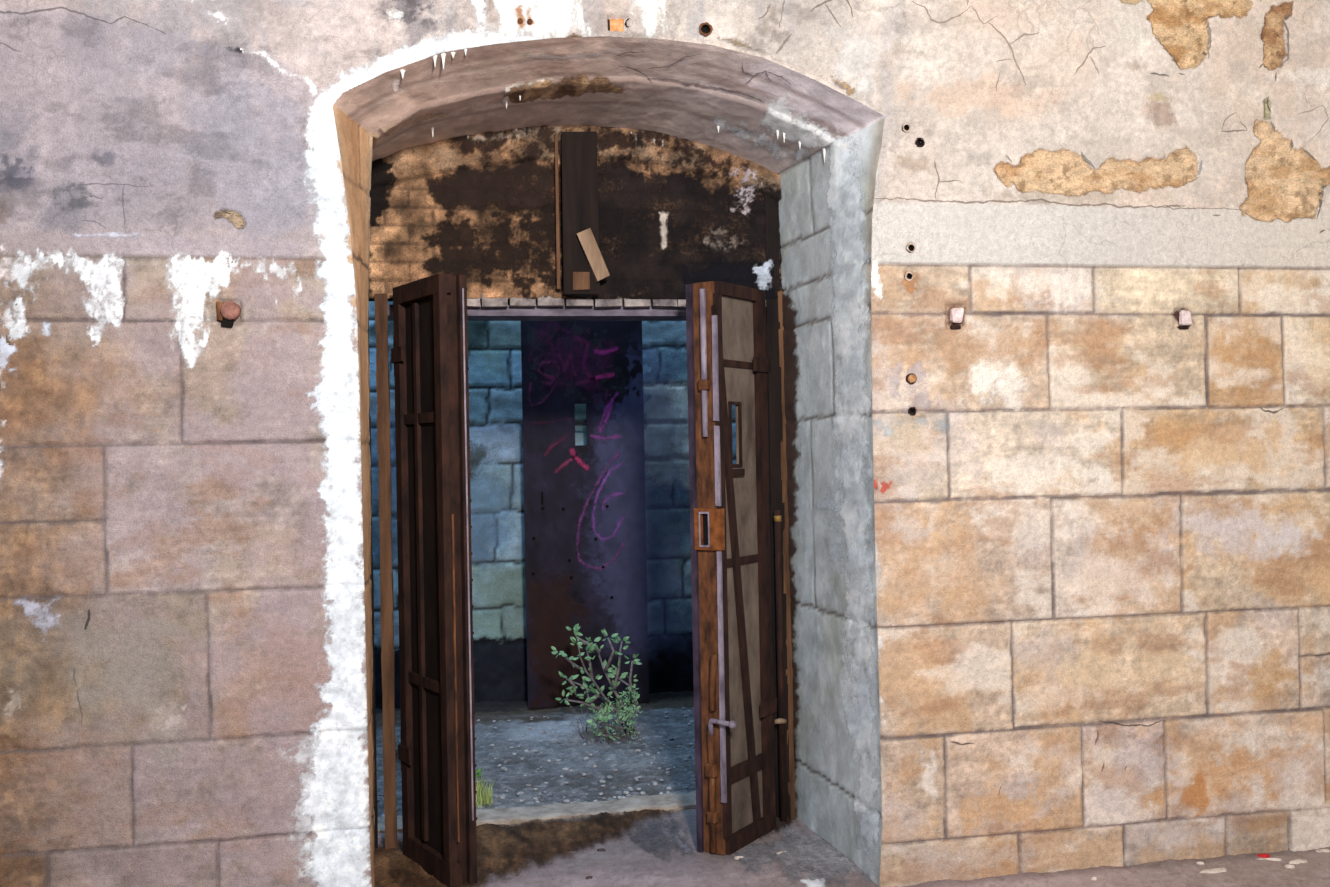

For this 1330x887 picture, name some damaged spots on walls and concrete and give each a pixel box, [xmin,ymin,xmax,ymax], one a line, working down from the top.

crack [0,7,166,52]
spalling [502,74,624,104]
crack [614,0,853,103]
crack [911,0,1039,91]
flaking render [1120,0,1293,81]
flaking render [994,146,1202,197]
flaking render [1240,98,1330,233]
damp [0,243,125,388]
damp [166,0,591,887]